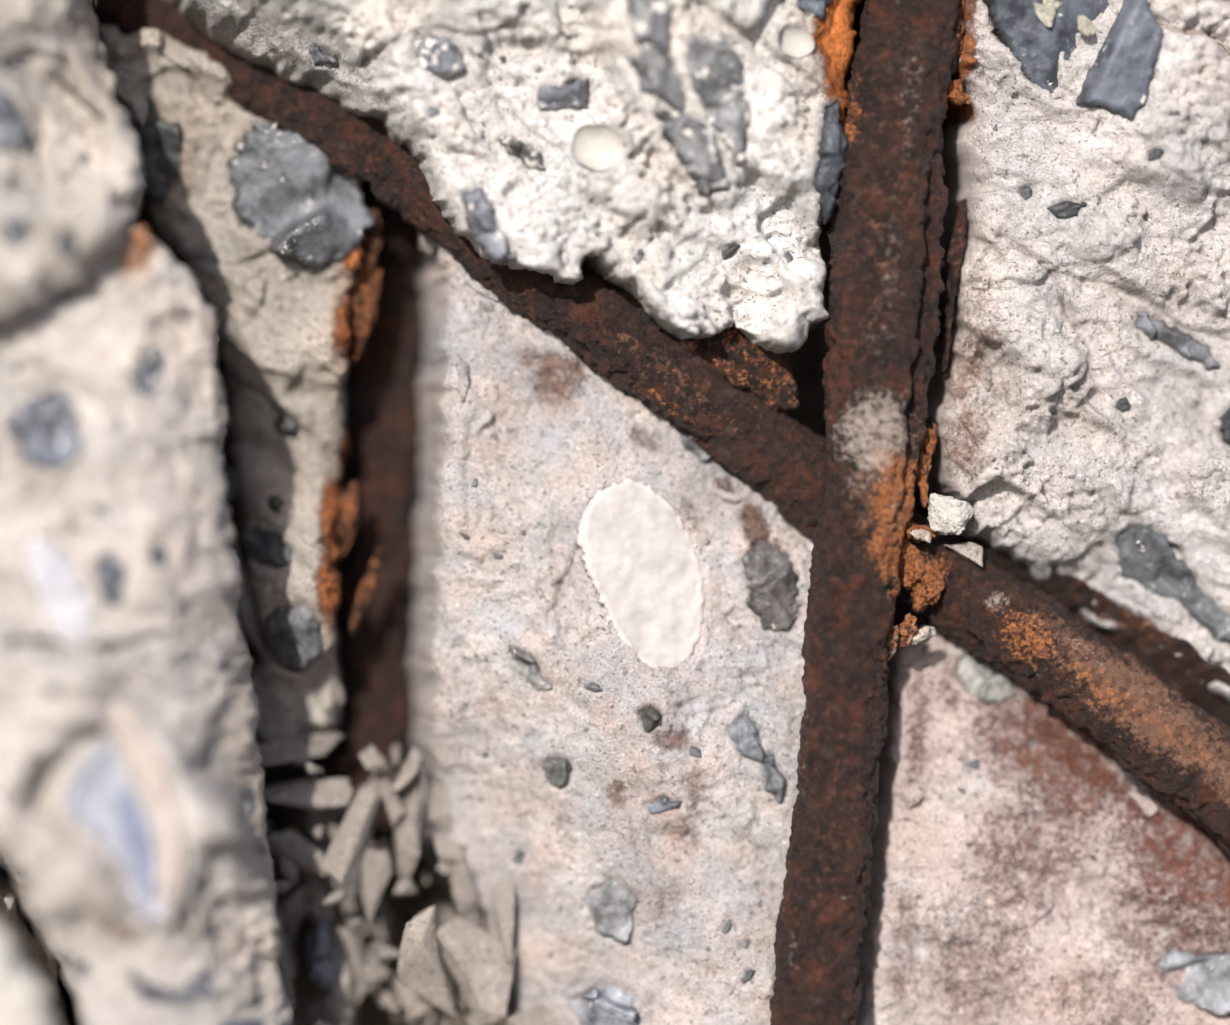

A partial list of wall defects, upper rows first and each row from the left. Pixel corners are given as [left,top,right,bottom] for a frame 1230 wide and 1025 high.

rust [811,0,863,127]
rust [941,0,978,130]
rust [331,247,364,365]
rust [655,325,799,413]
rust [933,312,998,398]
rust [949,412,977,465]
rust [314,424,349,630]
spalling [92,0,826,1025]
rust [741,499,783,554]
rust [914,497,929,520]
spalling [769,0,1230,1025]
rust [950,532,1230,726]